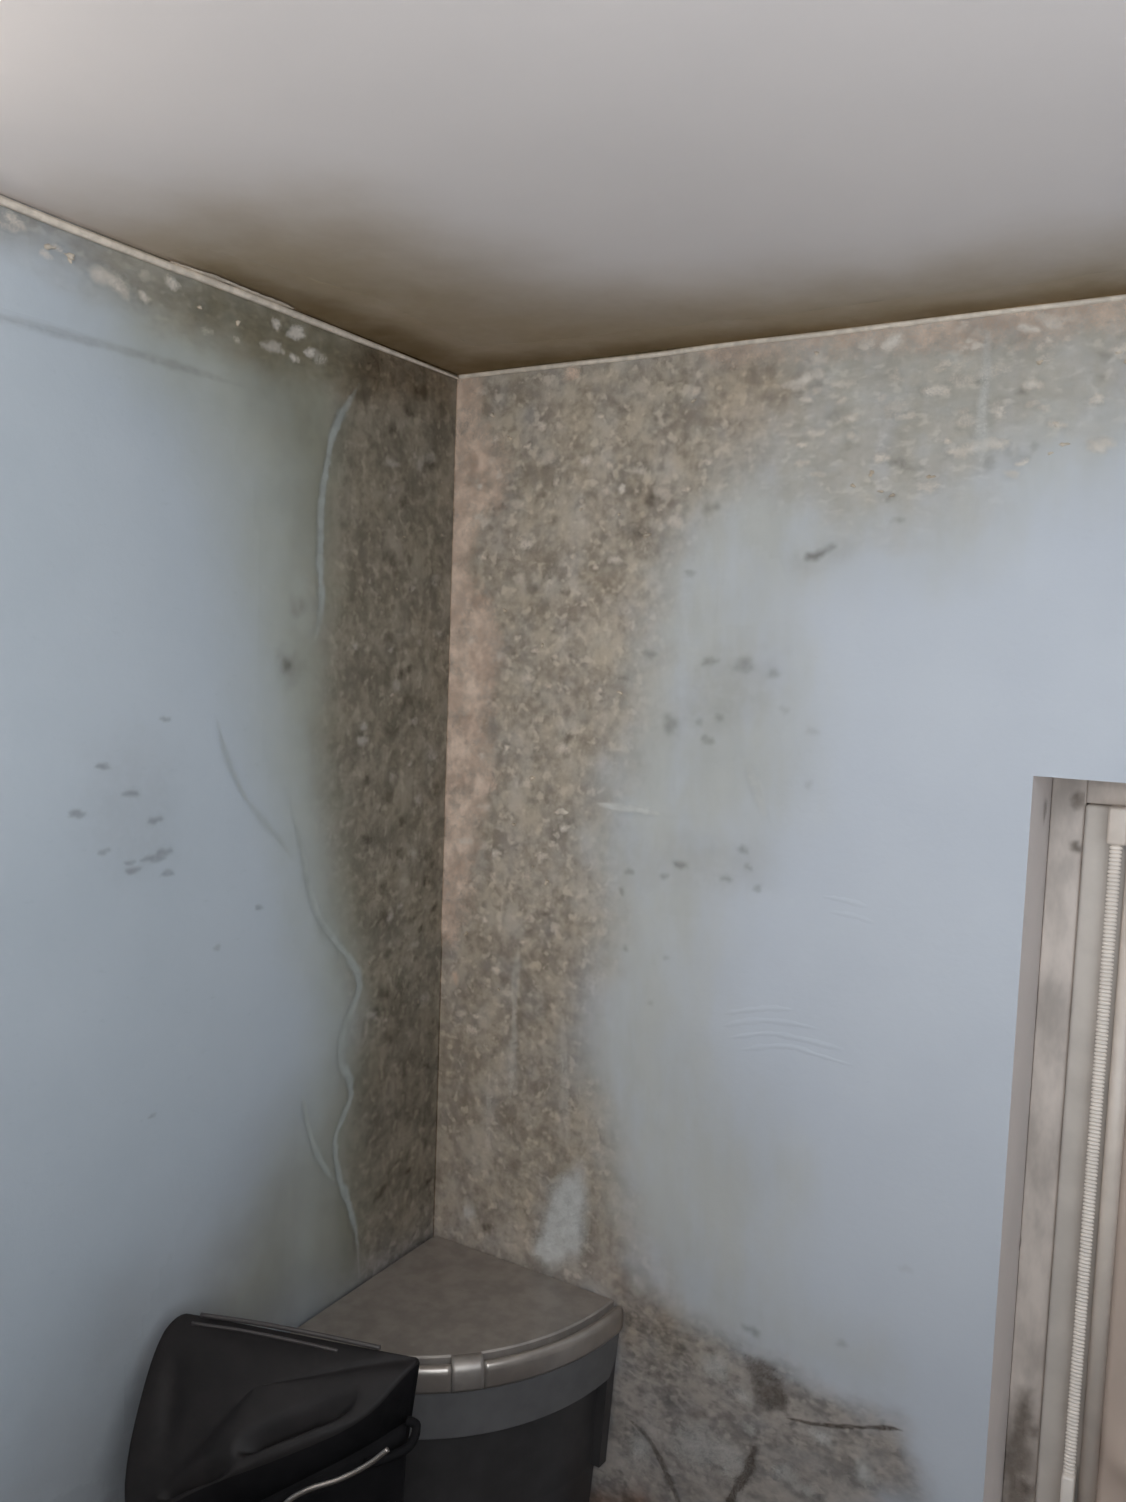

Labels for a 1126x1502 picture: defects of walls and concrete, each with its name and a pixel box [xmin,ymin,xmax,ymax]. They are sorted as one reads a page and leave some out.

damp [666,293,1126,478]
damp [579,455,690,538]
damp [623,1351,902,1502]